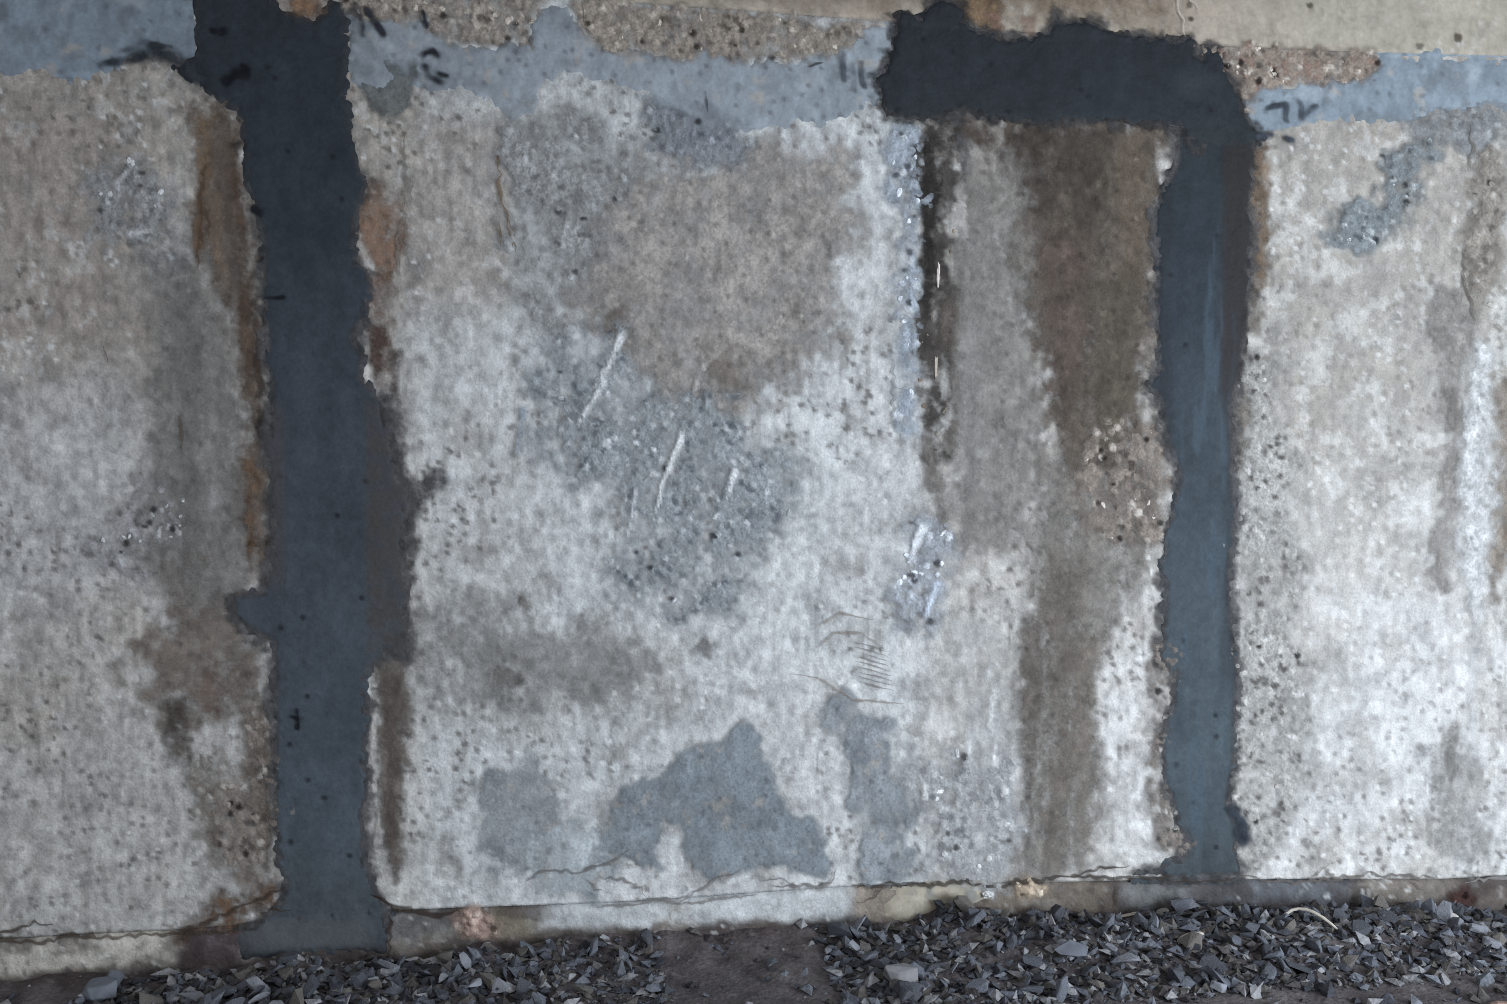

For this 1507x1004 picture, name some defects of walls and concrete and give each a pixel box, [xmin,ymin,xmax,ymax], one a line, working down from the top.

spalling [571,0,882,67]
spalling [1194,40,1381,112]
leakage [136,259,253,617]
leakage [910,116,1169,891]
leakage [1417,287,1498,863]
crack [526,849,1507,915]